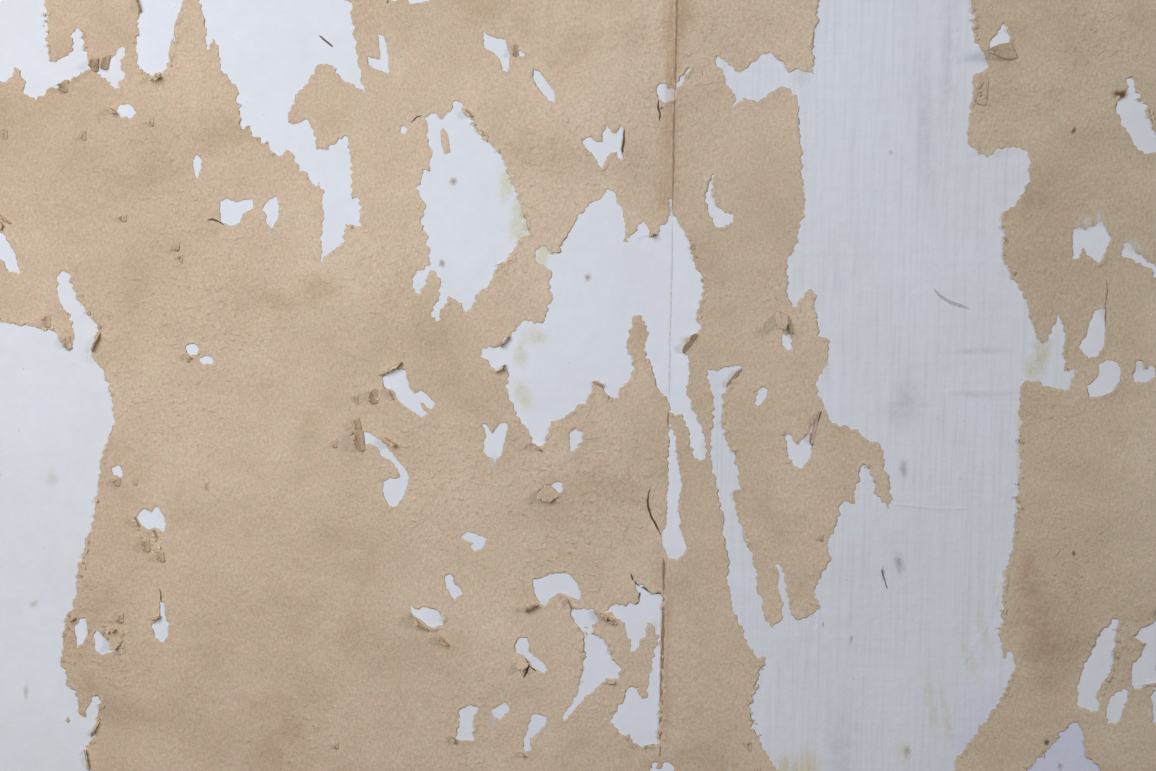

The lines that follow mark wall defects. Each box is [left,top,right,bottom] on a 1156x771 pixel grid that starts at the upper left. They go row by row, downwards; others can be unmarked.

peeling [0,215,23,277]
peeling [0,266,127,771]
peeling [0,0,393,266]
peeling [397,0,1156,771]